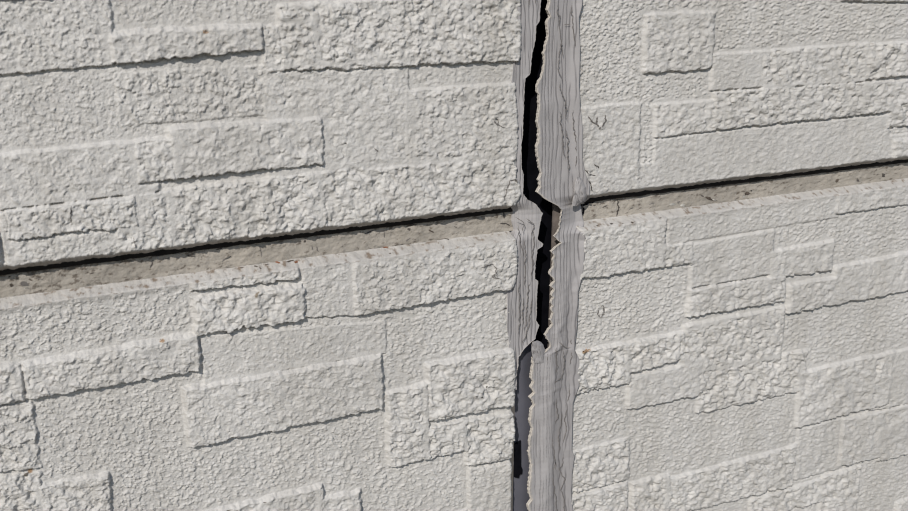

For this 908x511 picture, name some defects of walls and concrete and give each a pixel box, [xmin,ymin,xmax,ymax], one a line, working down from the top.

crack [482,0,620,511]